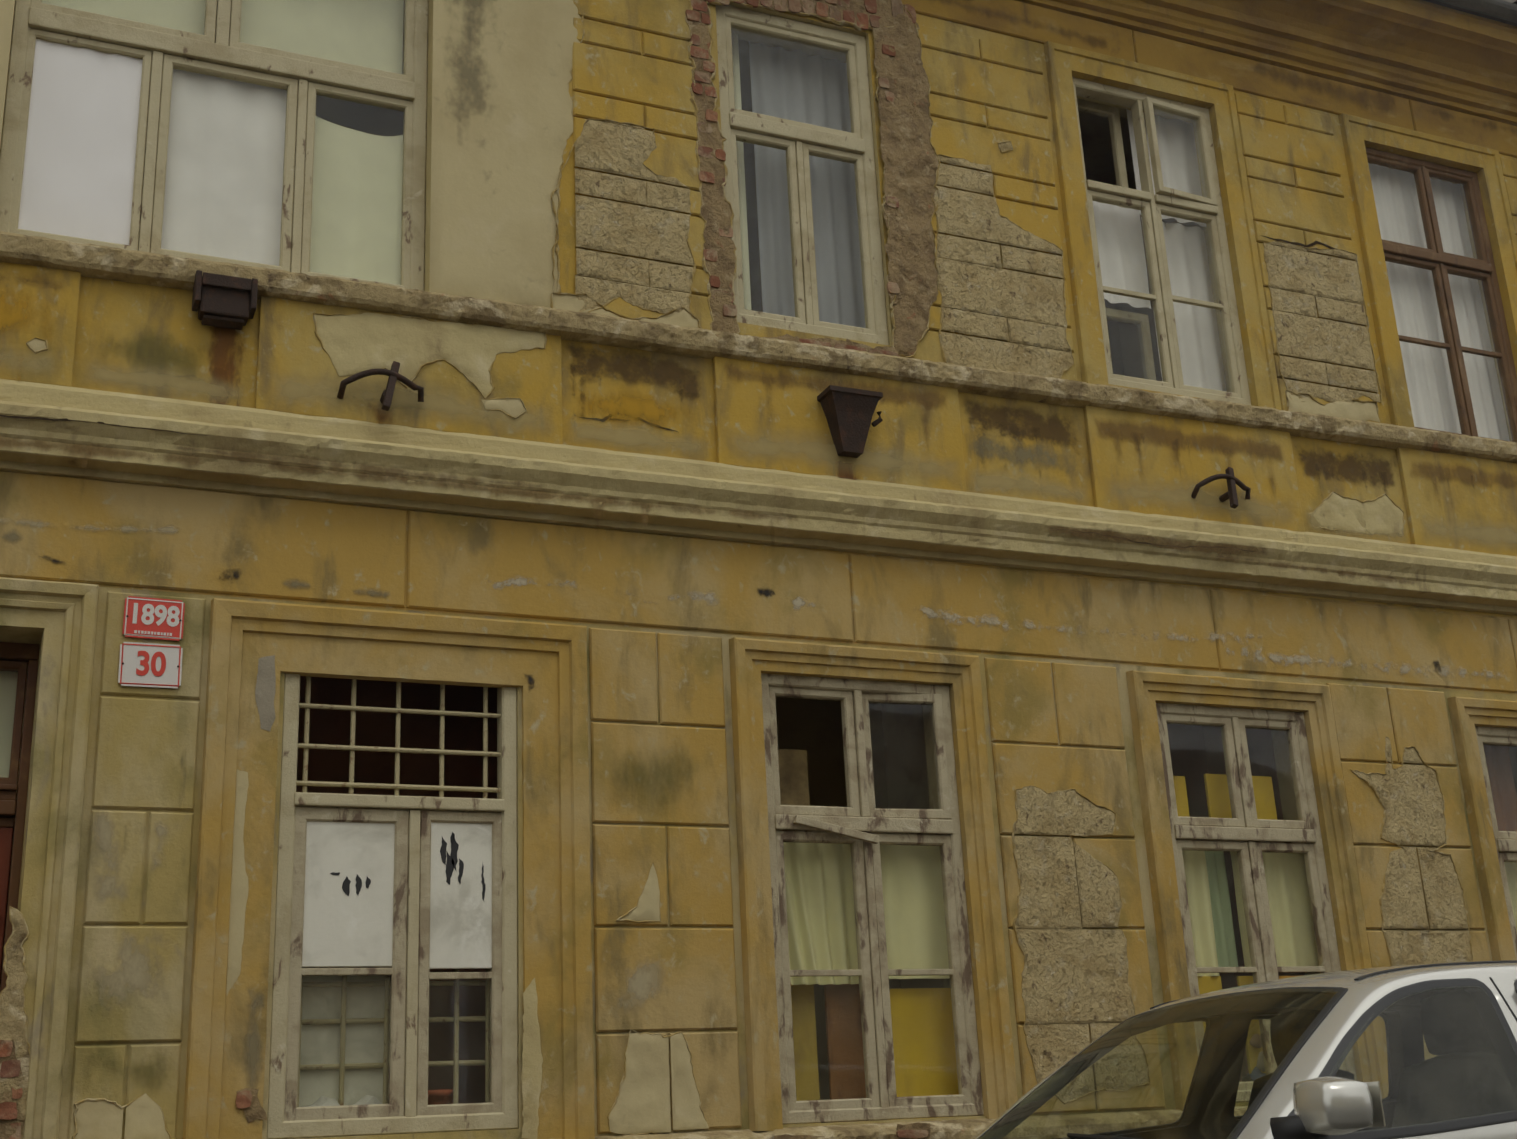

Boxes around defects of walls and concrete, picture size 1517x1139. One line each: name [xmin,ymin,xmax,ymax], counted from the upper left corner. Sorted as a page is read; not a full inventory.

flaking render [550,0,1074,379]
rust [209,326,241,405]
flaking render [313,313,547,419]
damp [570,346,698,398]
flaking render [1263,241,1382,422]
flaking render [1351,737,1473,966]
flaking render [1012,785,1151,1104]
flaking render [0,906,30,1139]
flaking render [72,1093,171,1139]
flaking render [235,1088,267,1123]
flaking render [607,1029,709,1135]
flaking render [1423,1035,1439,1060]